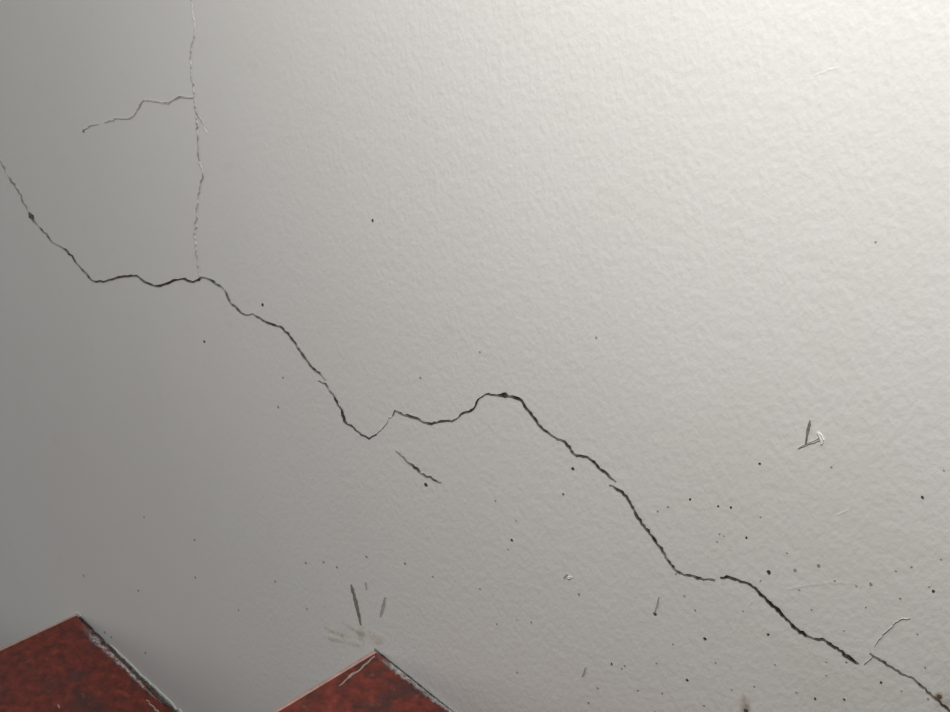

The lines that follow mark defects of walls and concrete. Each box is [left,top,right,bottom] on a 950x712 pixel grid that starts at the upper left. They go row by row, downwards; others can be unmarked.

crack [0,0,715,581]
crack [720,575,859,664]
crack [867,618,950,712]